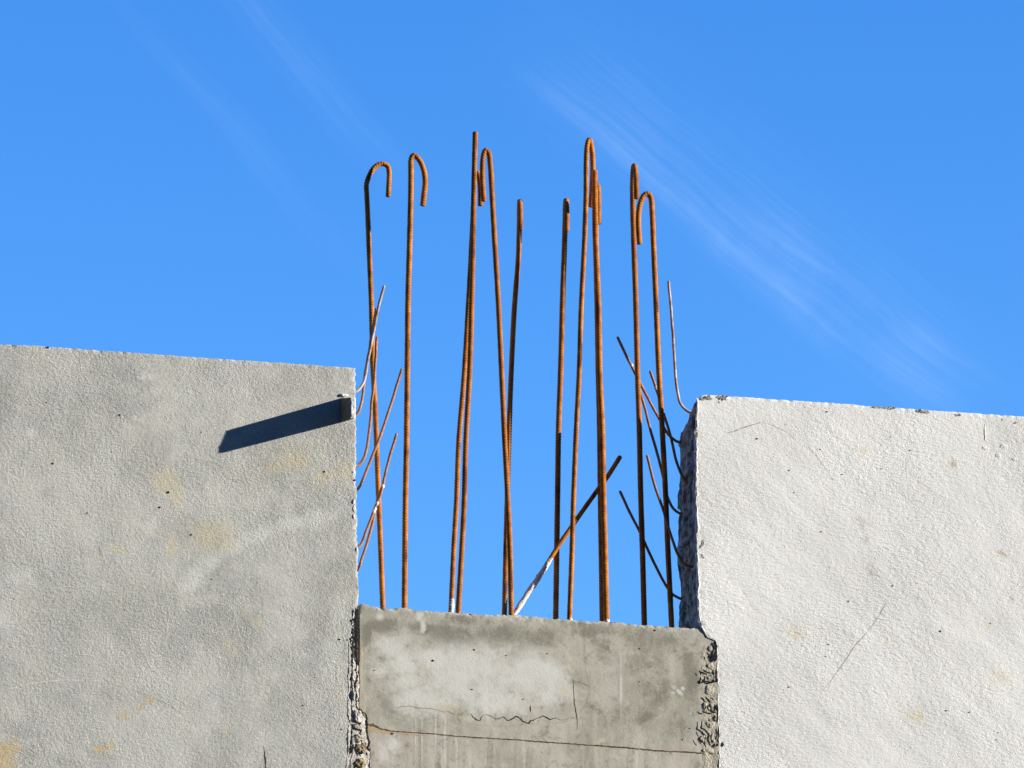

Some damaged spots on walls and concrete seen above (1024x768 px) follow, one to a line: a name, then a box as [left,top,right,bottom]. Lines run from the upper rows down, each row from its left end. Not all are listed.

crack [349,607,713,768]
spalling [694,394,728,768]